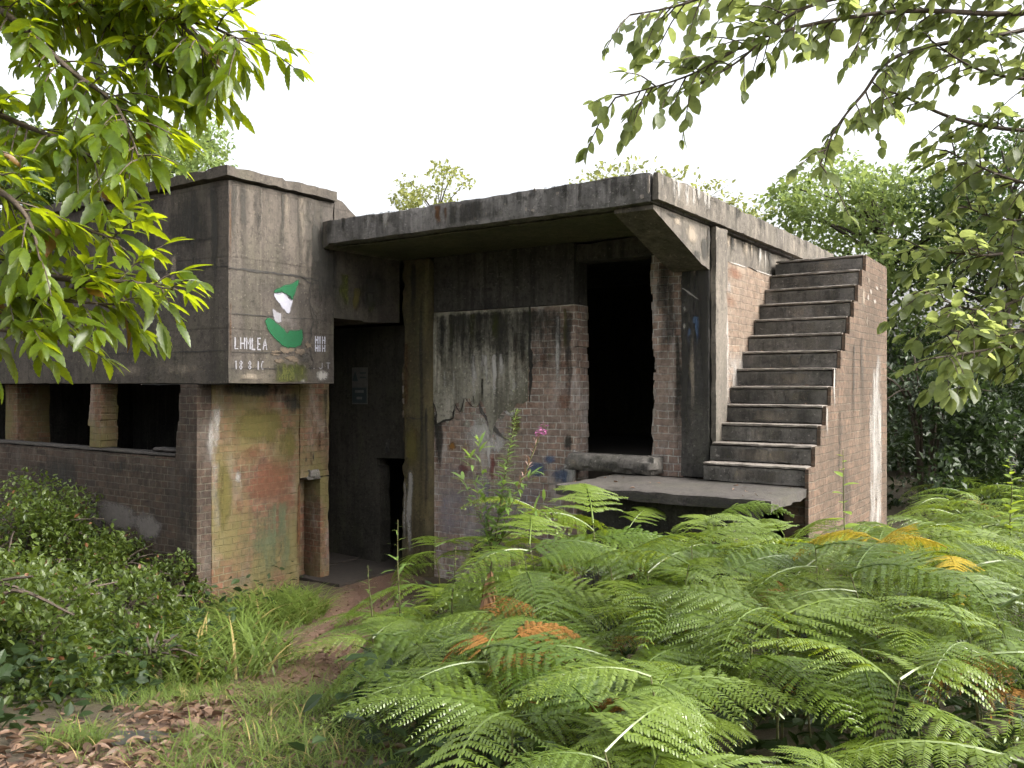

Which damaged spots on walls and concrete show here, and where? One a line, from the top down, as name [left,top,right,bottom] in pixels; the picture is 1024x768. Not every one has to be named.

leakage [450,182,582,223]
leakage [437,312,503,398]
leakage [209,412,220,447]
crack [433,396,474,424]